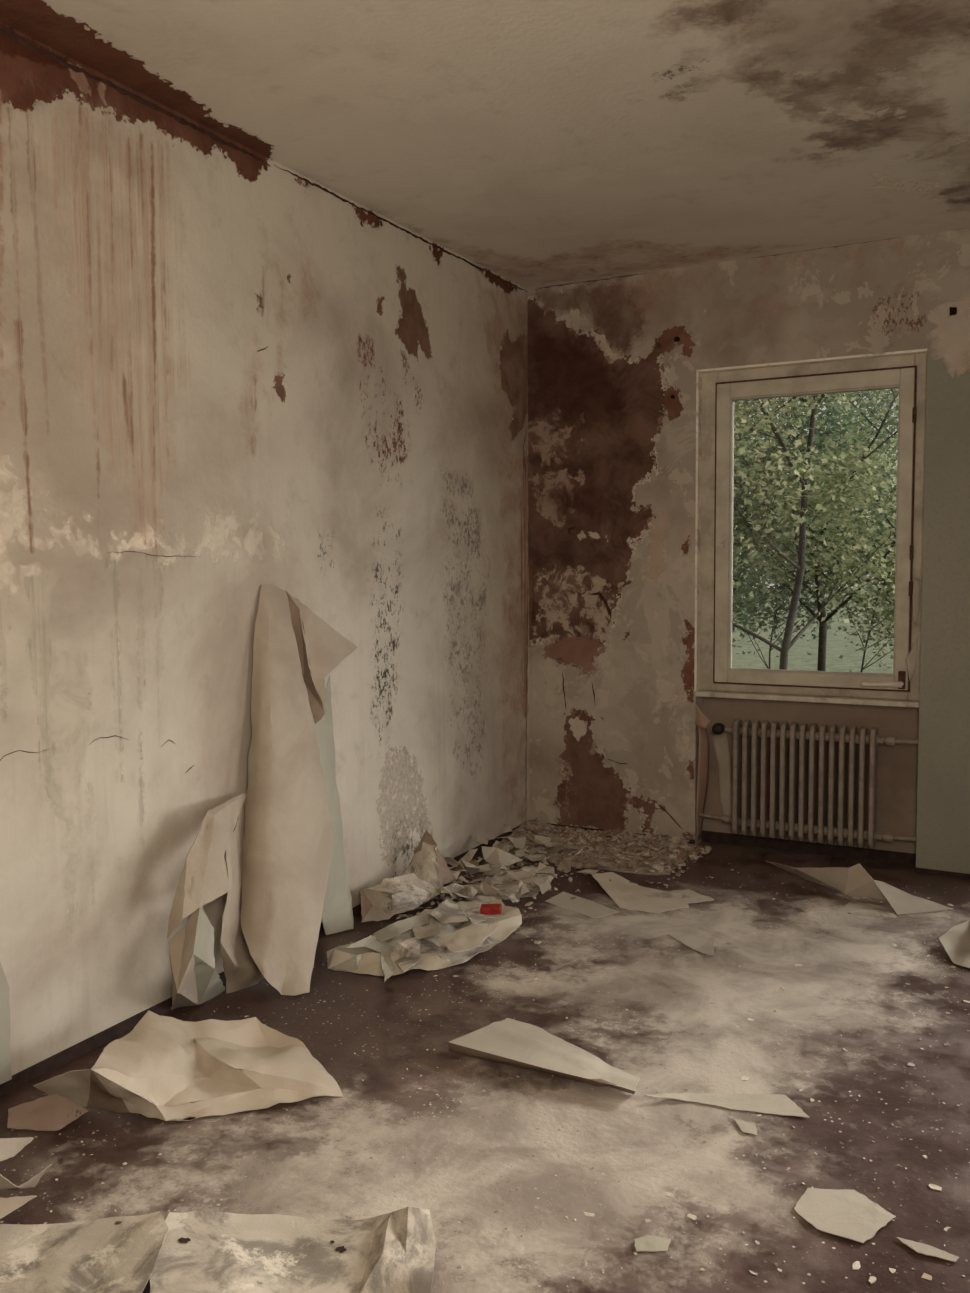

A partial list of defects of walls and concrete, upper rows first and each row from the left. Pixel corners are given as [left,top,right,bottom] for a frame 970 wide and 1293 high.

peeling [0,0,274,183]
leakage [779,0,970,150]
leakage [140,135,156,364]
leakage [357,336,422,485]
peeling [376,265,433,362]
leakage [371,514,401,743]
leakage [442,470,489,771]
peeling [499,286,696,840]